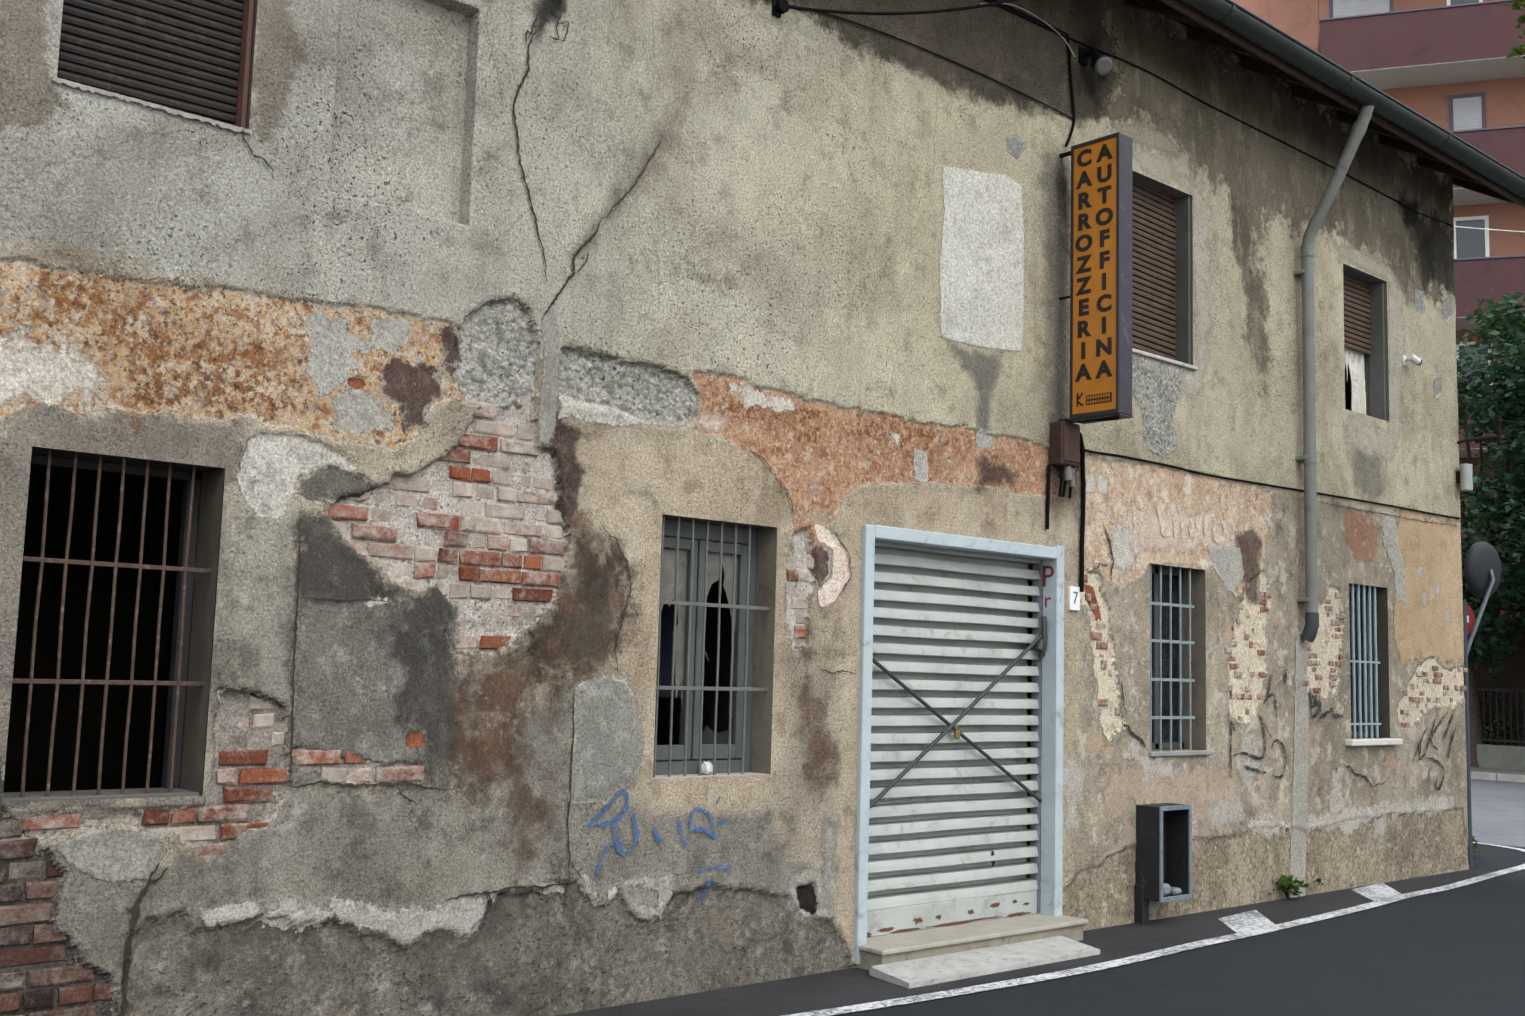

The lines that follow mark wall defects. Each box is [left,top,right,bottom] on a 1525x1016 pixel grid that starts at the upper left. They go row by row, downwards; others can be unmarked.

leakage [536,0,565,33]
crack [512,4,663,318]
leakage [787,0,1456,430]
peeling [0,257,572,656]
peeling [558,347,1060,659]
peeling [1076,147,1468,842]
flaking render [0,687,426,1016]
peeling [189,888,501,948]
peeling [532,872,674,920]
spalling [789,818,837,919]
flaking render [800,685,839,787]
peeling [1063,757,1083,834]